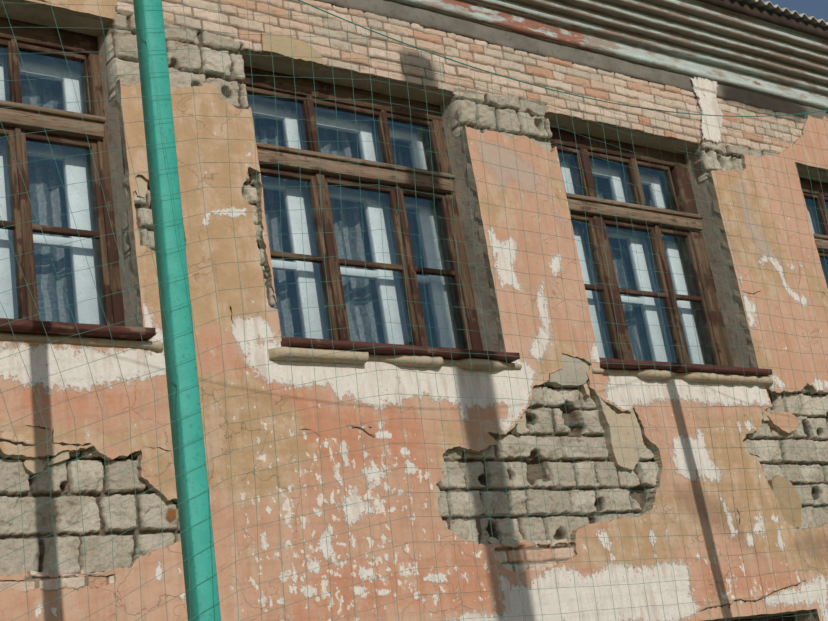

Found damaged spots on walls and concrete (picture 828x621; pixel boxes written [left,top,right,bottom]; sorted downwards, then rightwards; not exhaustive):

spalling [103,0,140,99]
spalling [162,0,806,183]
peeling [0,303,166,395]
spalling [202,170,276,308]
peeling [487,228,523,292]
peeling [737,275,759,331]
crack [0,424,91,446]
spalling [0,448,181,592]
spalling [230,281,700,621]
spalling [604,369,828,530]
peeling [670,428,787,553]
crack [696,575,806,612]